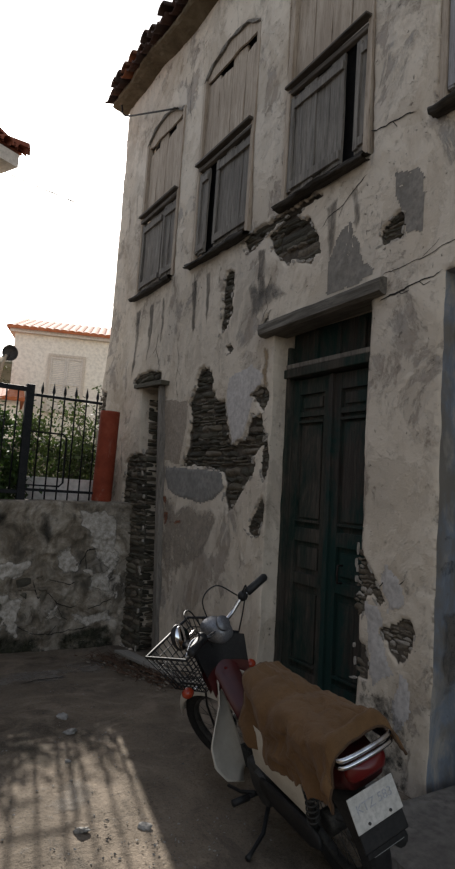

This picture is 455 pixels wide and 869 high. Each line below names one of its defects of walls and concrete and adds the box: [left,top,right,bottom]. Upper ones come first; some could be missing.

flaking render [239,193,374,295]
flaking render [376,167,425,249]
crack [380,239,455,301]
flaking render [218,274,235,356]
flaking render [57,368,269,652]
flaking render [0,560,51,638]
crack [17,548,111,635]
damp [59,625,112,650]
peeling [349,542,416,734]